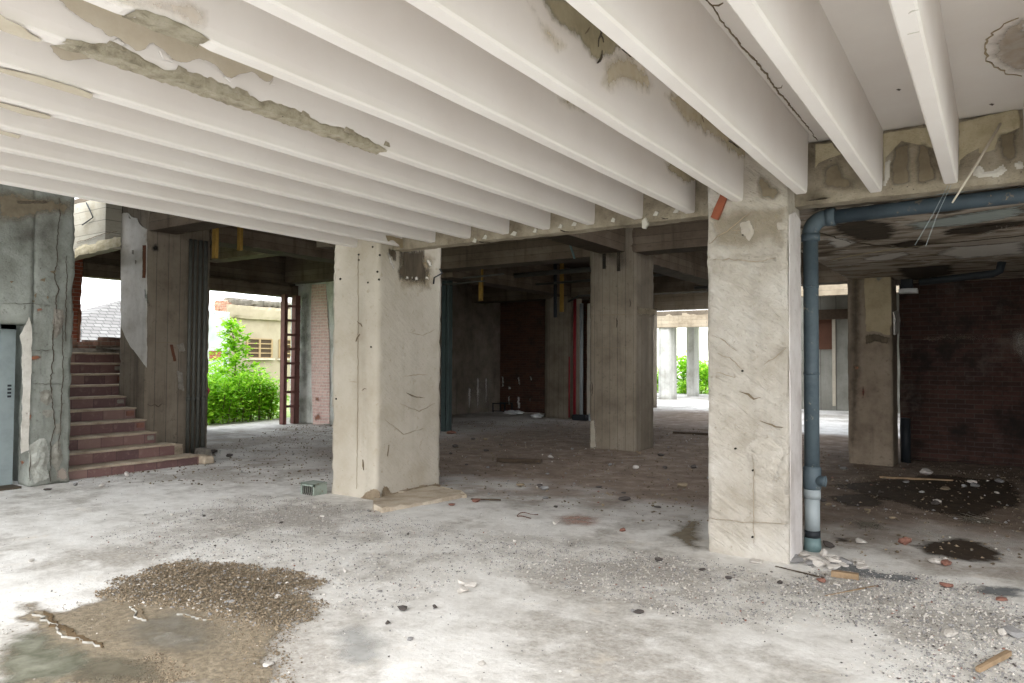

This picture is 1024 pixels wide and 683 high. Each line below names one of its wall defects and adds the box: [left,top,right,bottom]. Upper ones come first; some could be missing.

spalling [0,0,390,155]
crack [706,0,818,141]
damp [984,18,1024,77]
flaking render [815,143,841,168]
flaking render [883,127,933,186]
flaking render [958,103,1024,178]
damp [833,220,926,248]
damp [944,221,1024,235]
crack [8,198,117,482]